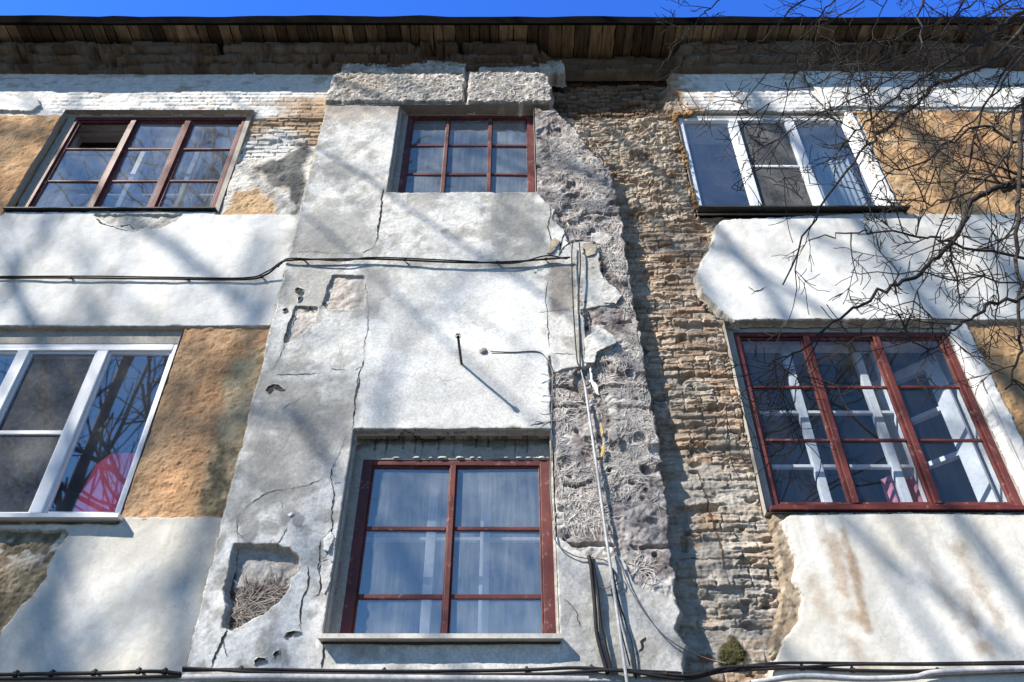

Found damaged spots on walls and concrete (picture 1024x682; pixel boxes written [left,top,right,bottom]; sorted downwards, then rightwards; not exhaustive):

spalling [238,111,325,164]
crack [298,190,384,253]
spalling [285,277,366,343]
spalling [533,81,801,682]
crack [236,283,469,629]
spalling [0,522,81,635]
spalling [225,549,299,631]
crack [211,629,227,667]